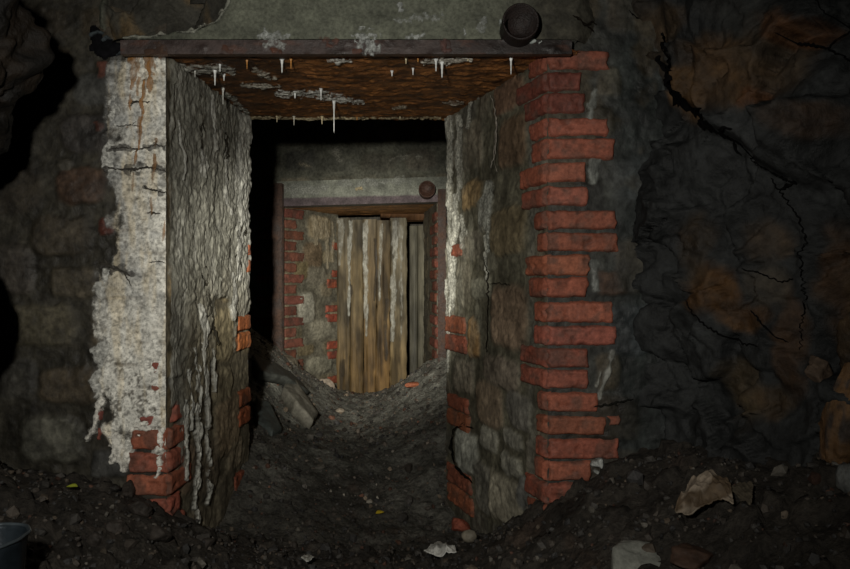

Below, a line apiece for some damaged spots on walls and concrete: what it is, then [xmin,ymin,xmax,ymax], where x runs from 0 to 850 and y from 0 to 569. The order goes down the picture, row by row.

crack [102,100,167,217]
rust [127,41,167,162]
leakage [84,57,479,524]
crack [655,32,808,350]